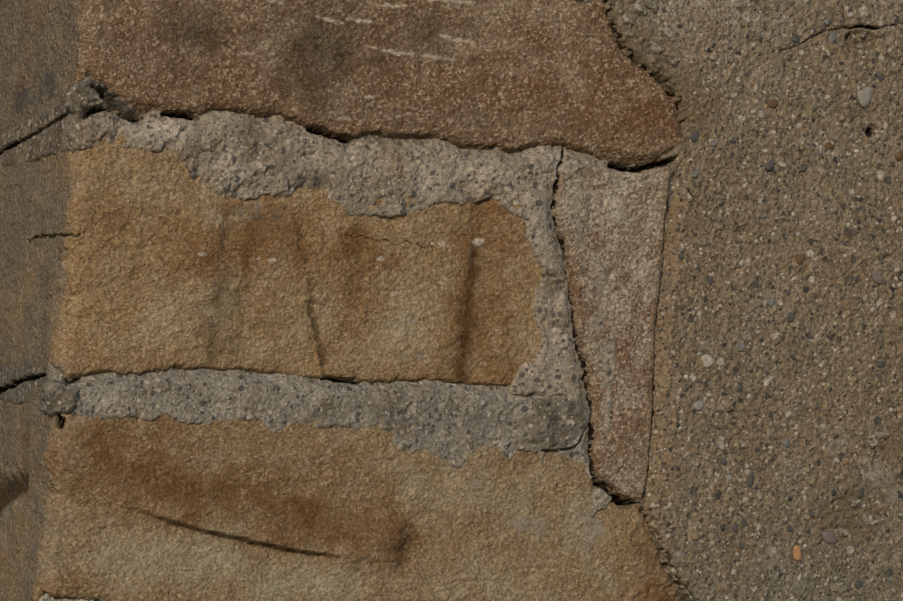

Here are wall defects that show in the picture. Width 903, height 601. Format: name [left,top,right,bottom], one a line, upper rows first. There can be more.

crack [781,1,903,51]
crack [27,233,80,243]
crack [541,149,695,601]